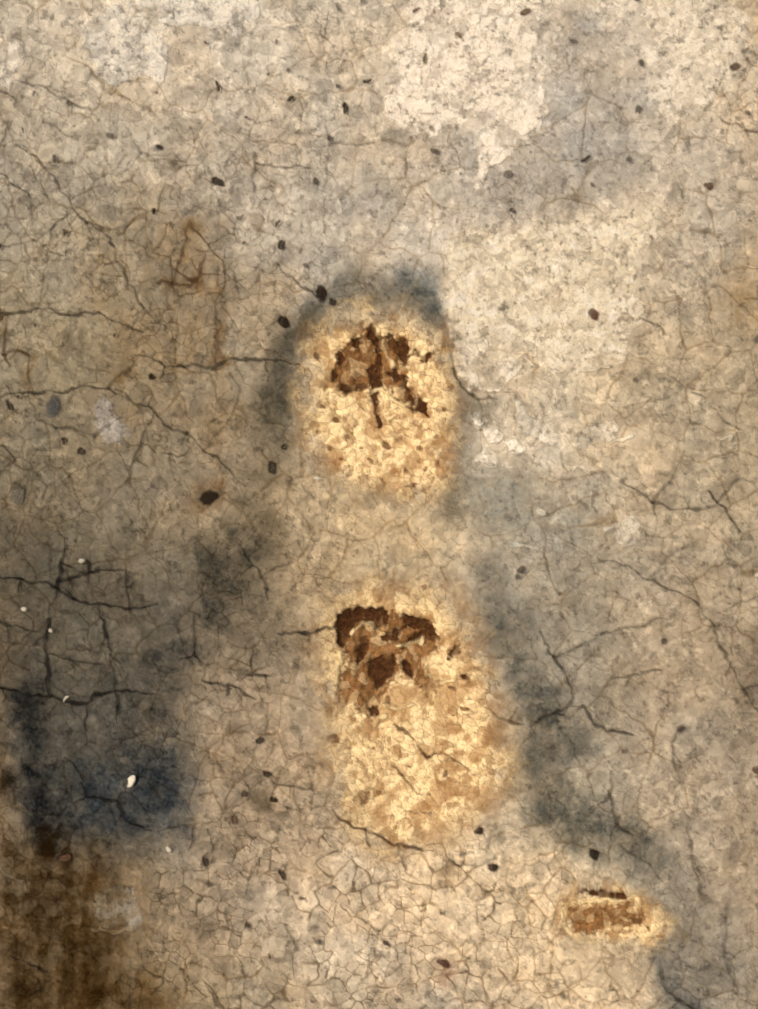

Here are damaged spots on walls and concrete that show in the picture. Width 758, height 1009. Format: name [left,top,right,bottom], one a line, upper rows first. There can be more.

crack [155,226,225,289]
crack [1,308,113,397]
crack [213,337,288,369]
spalling [295,205,658,502]
crack [0,538,153,724]
crack [181,643,268,697]
crack [278,626,336,636]
spalling [317,577,514,859]
crack [511,654,630,734]
crack [603,774,630,834]
crack [337,817,456,871]
spalling [554,879,673,958]